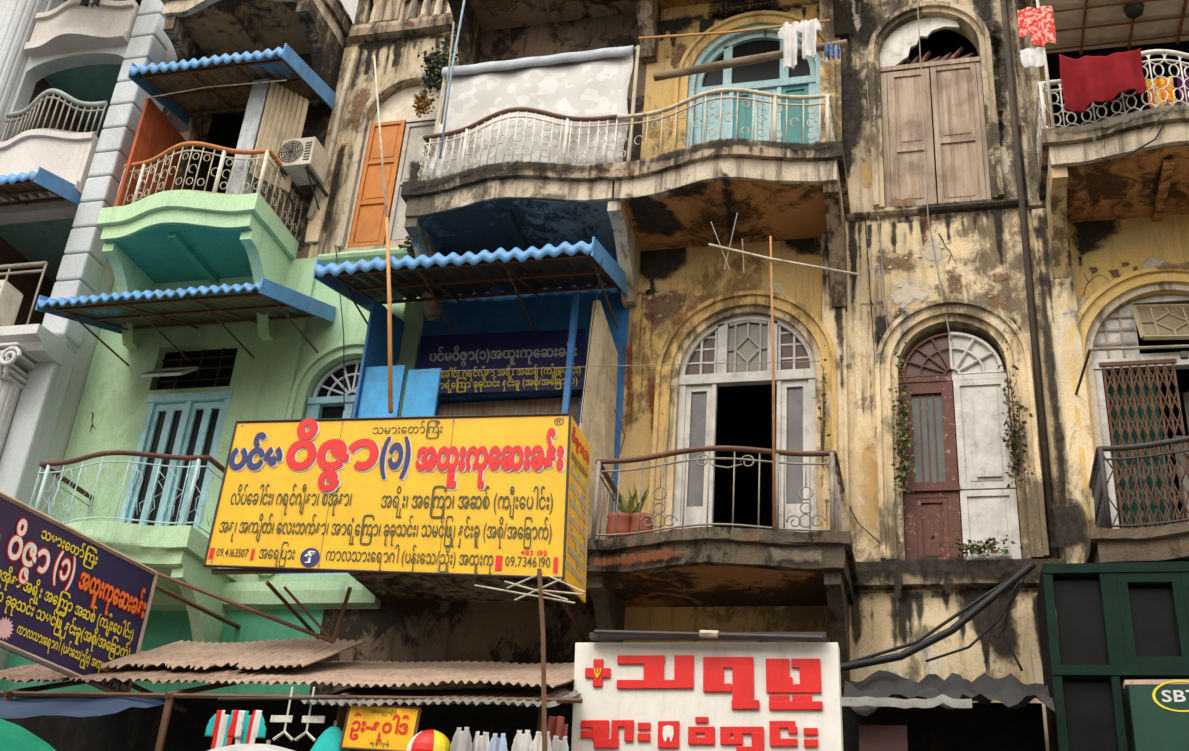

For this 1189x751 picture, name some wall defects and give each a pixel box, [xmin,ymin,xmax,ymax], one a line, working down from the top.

leakage [722,173,736,232]
leakage [625,182,707,359]
leakage [784,200,1020,388]
peeling [875,238,962,310]
peeling [1141,256,1189,270]
leakage [851,553,1042,672]